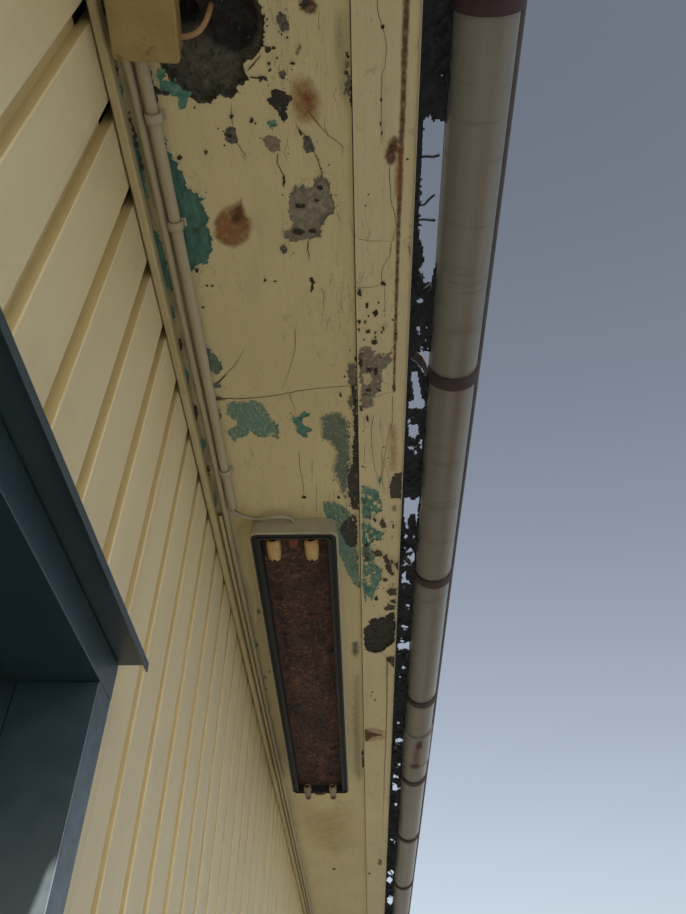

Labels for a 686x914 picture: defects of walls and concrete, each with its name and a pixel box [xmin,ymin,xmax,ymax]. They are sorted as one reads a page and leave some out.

spalling [150,0,342,278]
corrosion [215,199,249,245]
corrosion [385,0,410,392]
crack [213,337,343,409]
peeling [218,397,282,442]
peeling [287,289,402,667]
corrosion [365,701,387,755]